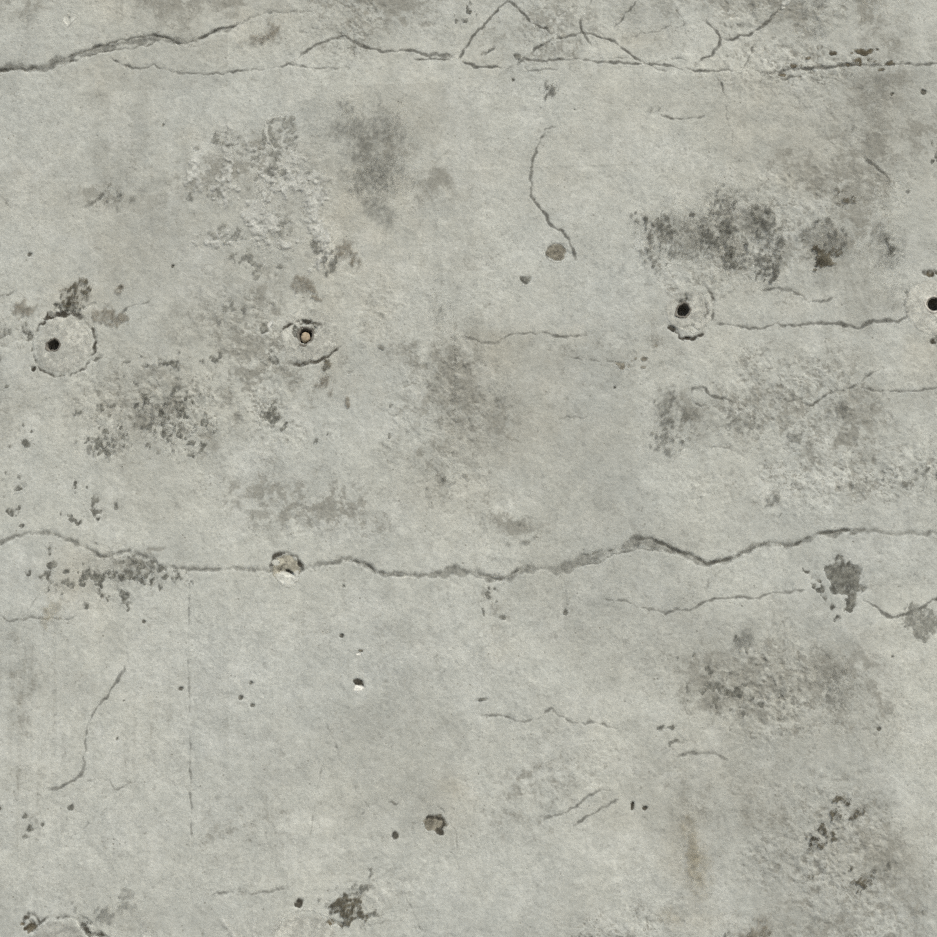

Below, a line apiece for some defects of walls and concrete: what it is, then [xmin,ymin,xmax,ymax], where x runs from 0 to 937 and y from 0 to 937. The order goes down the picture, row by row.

crack [0,28,228,72]
crack [288,2,671,68]
crack [695,15,773,89]
crack [777,63,858,79]
crack [531,195,575,255]
damp [702,205,785,283]
crack [783,318,902,328]
hole [270,552,303,587]
crack [319,558,531,582]
crack [623,535,801,566]
peeling [803,554,865,621]
peeling [905,602,937,642]